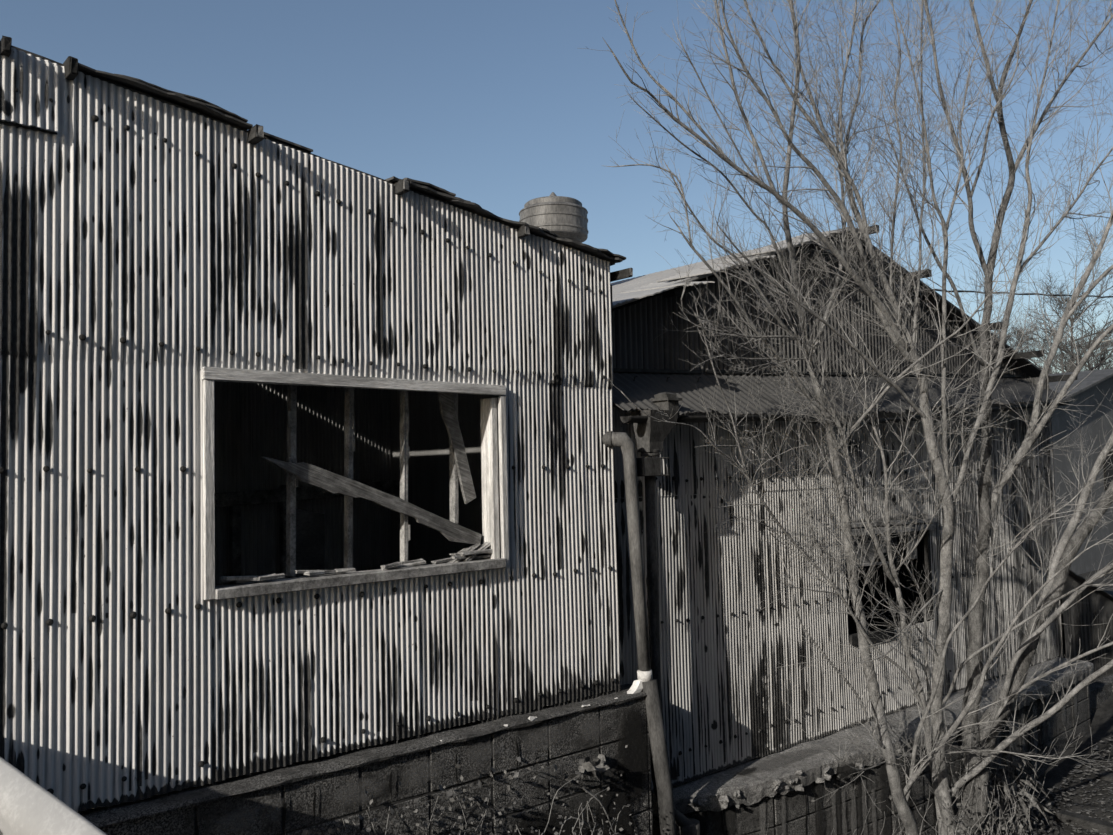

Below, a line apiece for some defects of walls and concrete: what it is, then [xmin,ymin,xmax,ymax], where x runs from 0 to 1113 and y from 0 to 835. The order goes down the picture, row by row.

rust [0,106,630,815]
rust [646,409,1113,787]